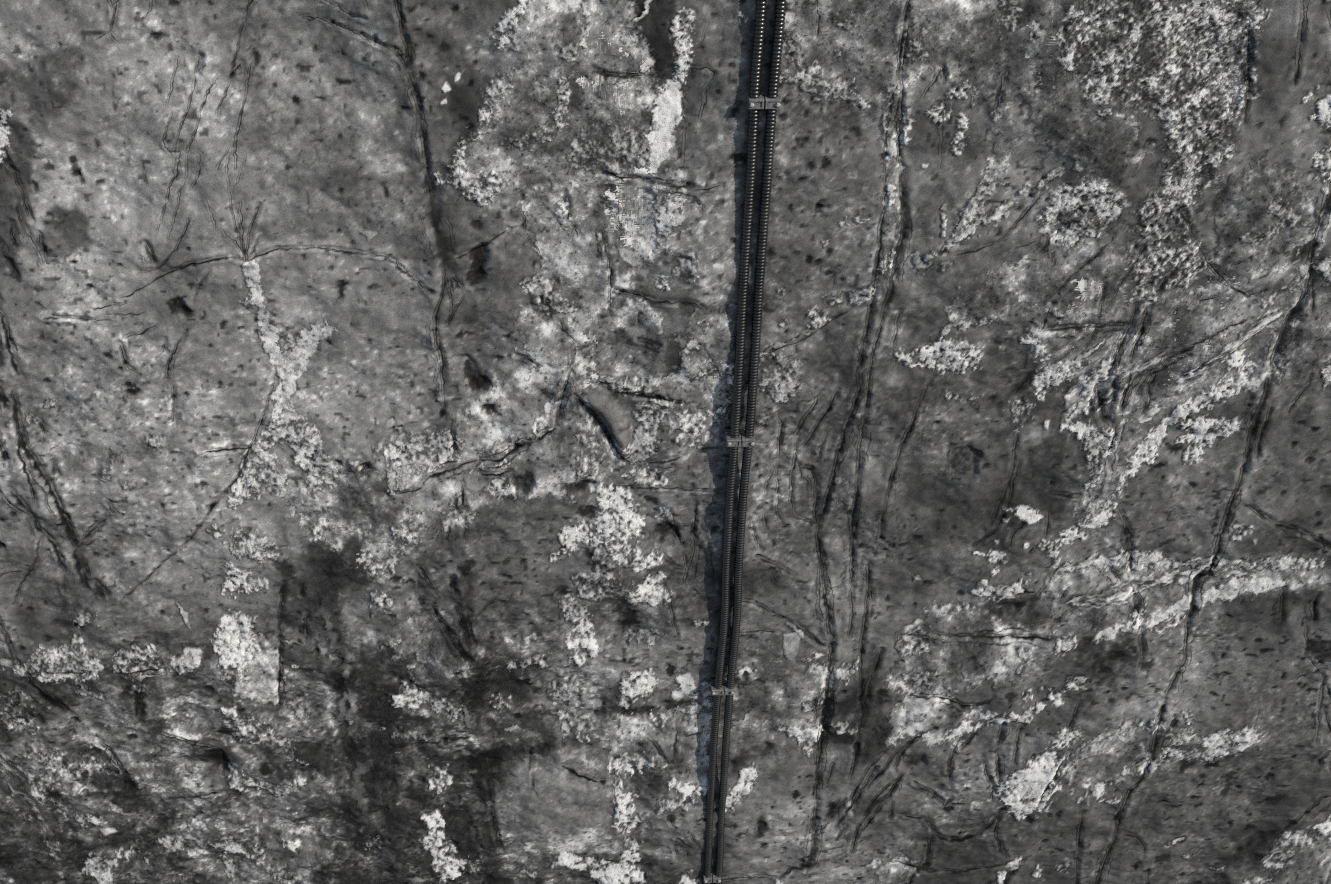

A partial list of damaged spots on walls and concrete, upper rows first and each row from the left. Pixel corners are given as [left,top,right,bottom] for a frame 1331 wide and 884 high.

crack [0,312,275,714]
damp [0,257,674,884]
crack [36,0,720,634]
crack [505,725,606,796]
damp [633,7,696,177]
crack [724,0,1027,884]
crack [939,627,1052,648]
damp [909,97,1127,275]
damp [895,255,1331,682]
damp [993,711,1266,821]
damp [1056,0,1271,207]
crack [1041,167,1331,884]